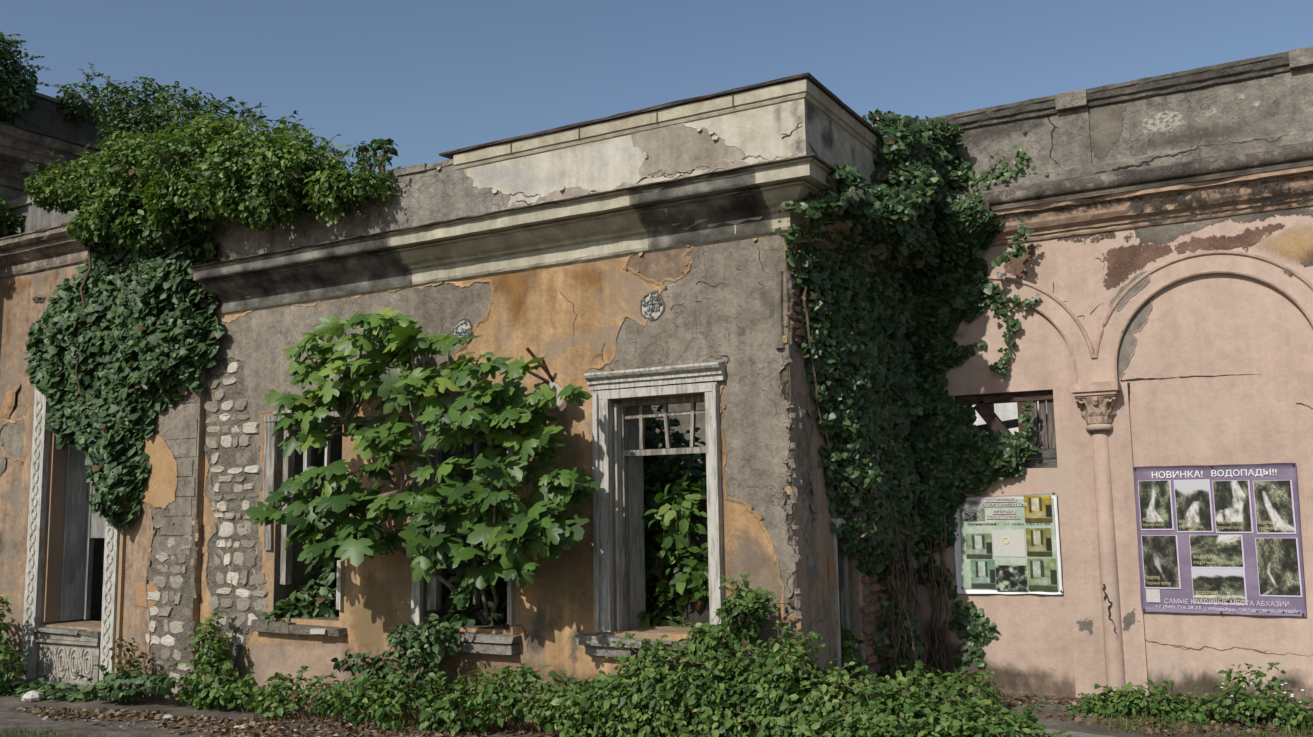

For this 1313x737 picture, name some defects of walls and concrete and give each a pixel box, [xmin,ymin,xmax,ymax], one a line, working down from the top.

flaking render [204,123,767,262]
leakage [631,168,771,249]
peeling [1003,243,1042,280]
crack [1047,116,1061,168]
peeling [1057,207,1313,380]
crack [1094,133,1290,174]
flaking render [134,279,495,705]
flaking render [582,233,831,677]